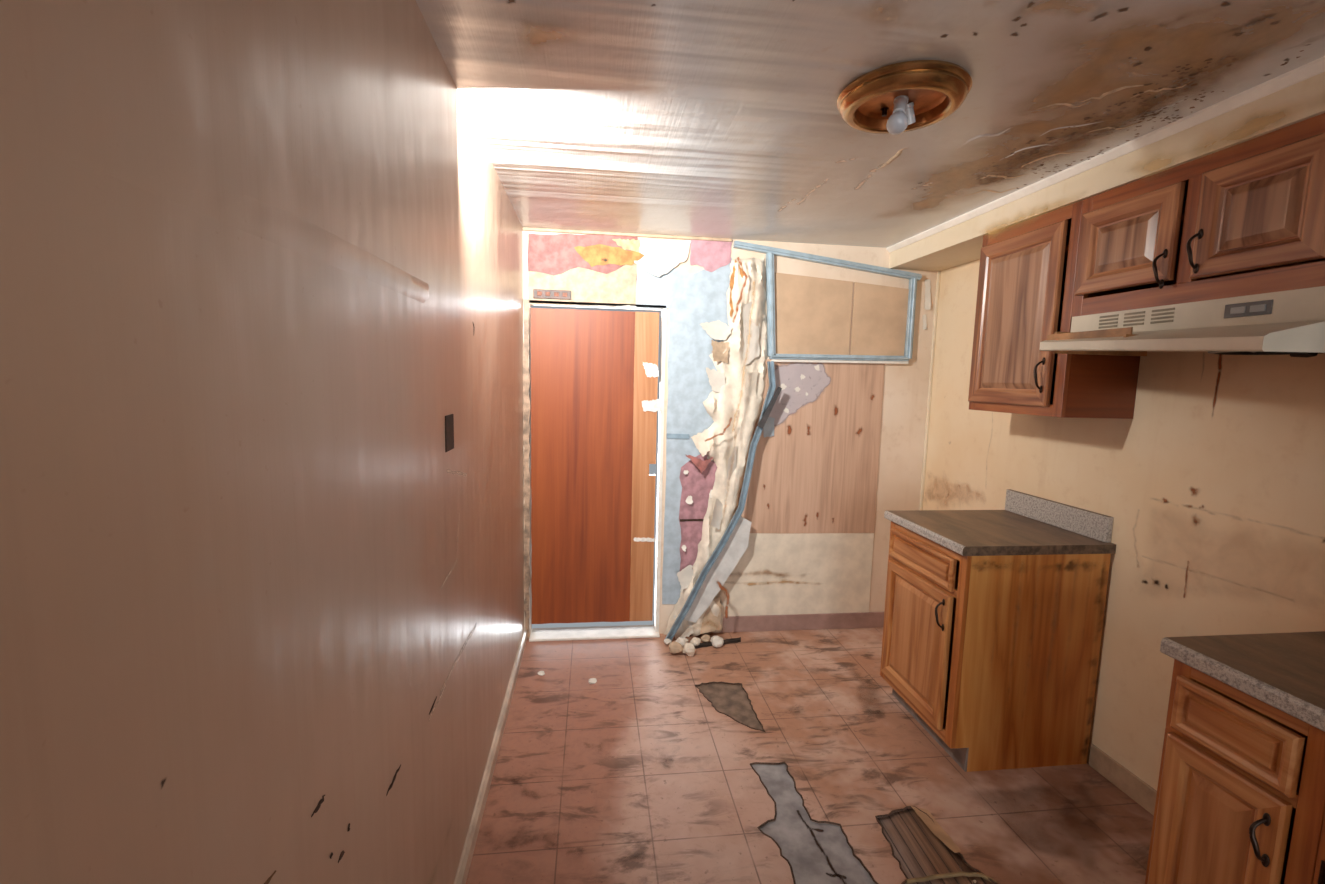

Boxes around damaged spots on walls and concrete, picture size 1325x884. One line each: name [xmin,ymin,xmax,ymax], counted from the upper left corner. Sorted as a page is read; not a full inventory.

leakage [914,8,1301,209]
peeling [527,233,644,276]
peeling [690,240,744,393]
peeling [745,371,758,398]
peeling [677,429,737,592]